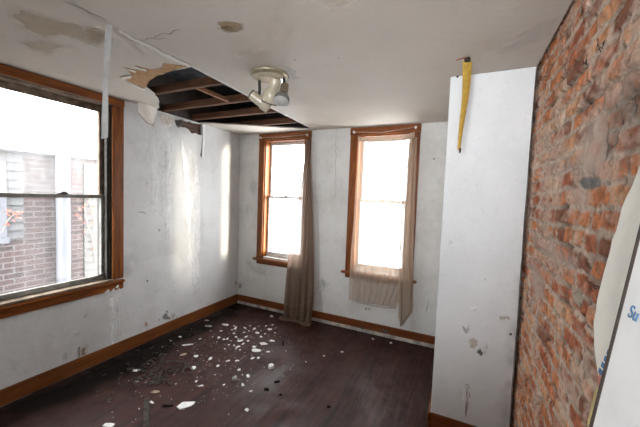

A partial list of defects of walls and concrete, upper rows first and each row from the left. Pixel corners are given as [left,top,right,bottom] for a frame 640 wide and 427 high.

leakage [15,12,105,44]
leakage [218,21,243,32]
spalling [191,65,249,96]
peeling [138,102,172,126]